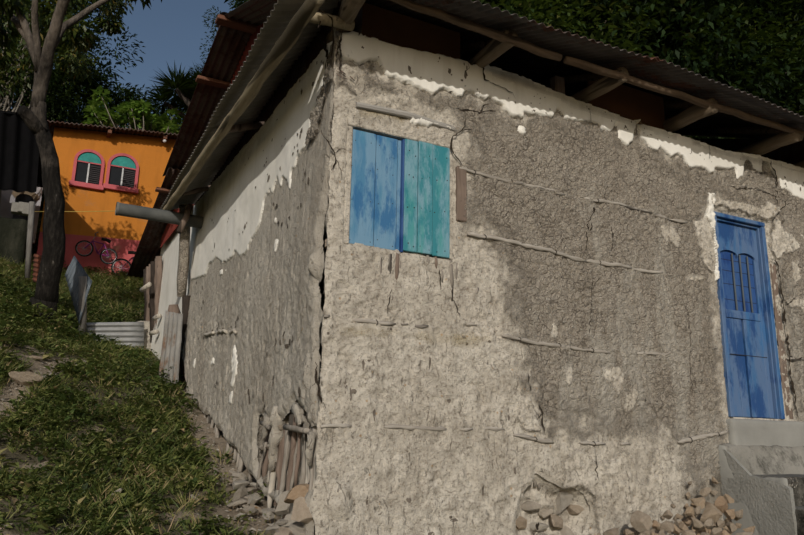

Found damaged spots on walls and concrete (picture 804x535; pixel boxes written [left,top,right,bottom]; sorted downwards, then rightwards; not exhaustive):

crack [321,130,343,179]
crack [450,104,494,166]
spalling [189,31,804,535]
crack [772,259,802,417]
crack [312,362,326,408]